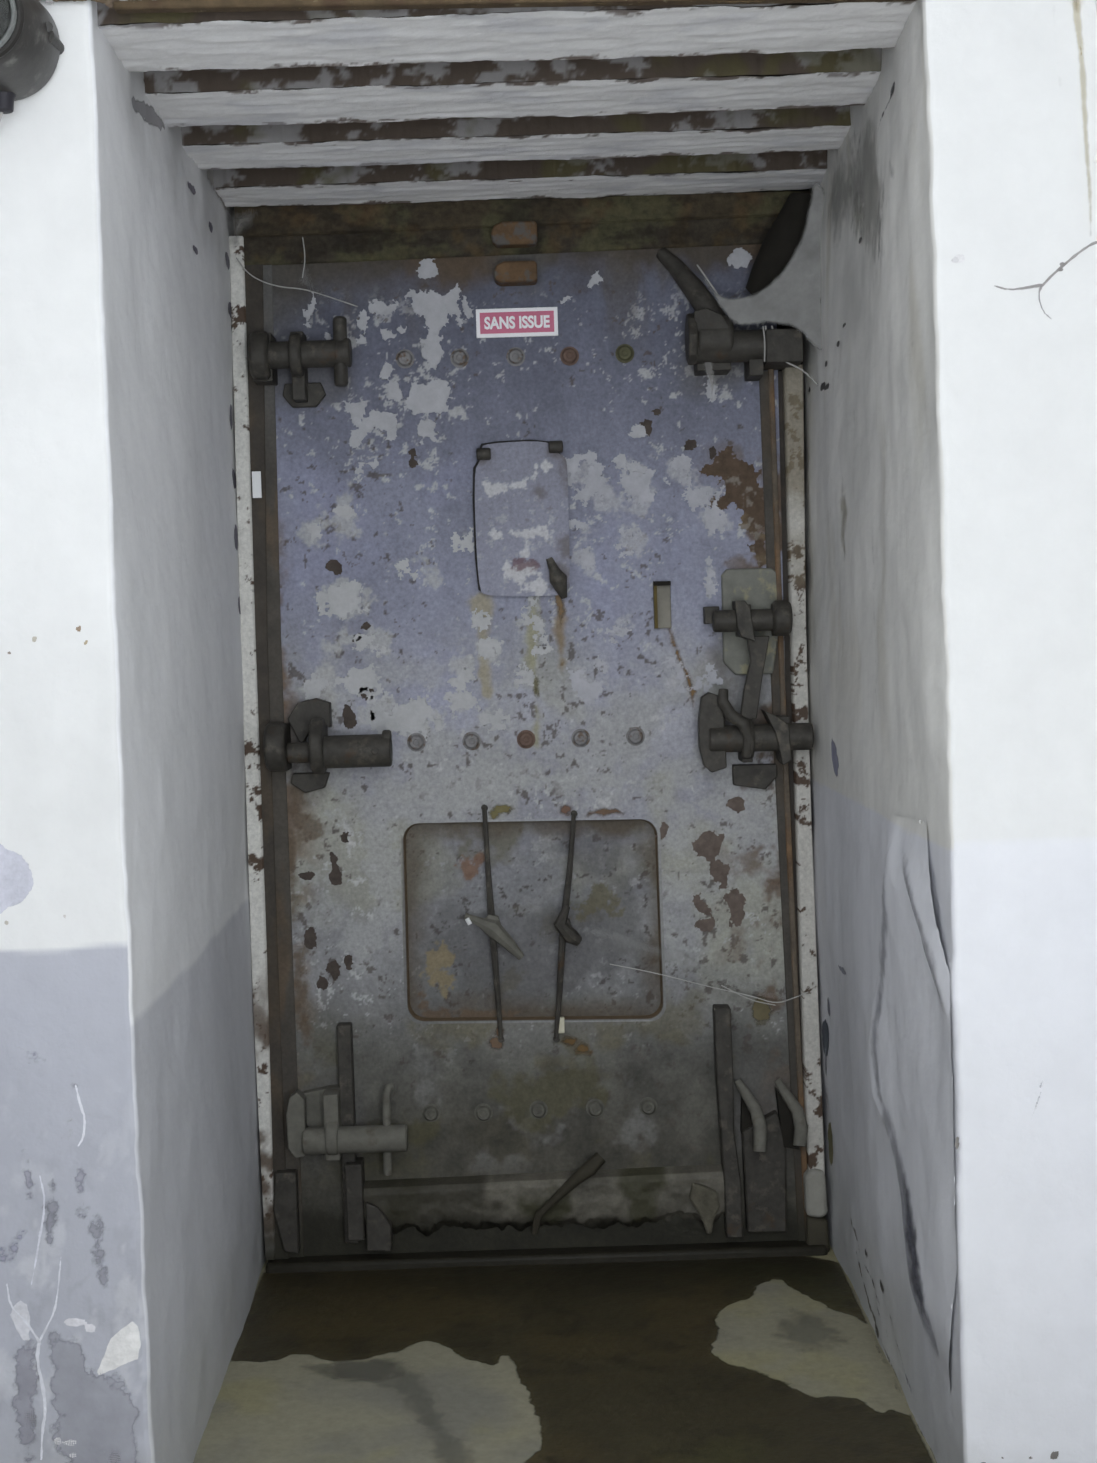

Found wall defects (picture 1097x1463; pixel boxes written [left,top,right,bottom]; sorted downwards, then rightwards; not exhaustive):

crack [996,241,1097,317]
flaking render [0,844,34,925]
peeling [45,1183,58,1244]
peeling [79,1214,108,1285]
damp [905,1193,923,1310]
peeling [10,1301,141,1463]
damp [232,1250,935,1463]